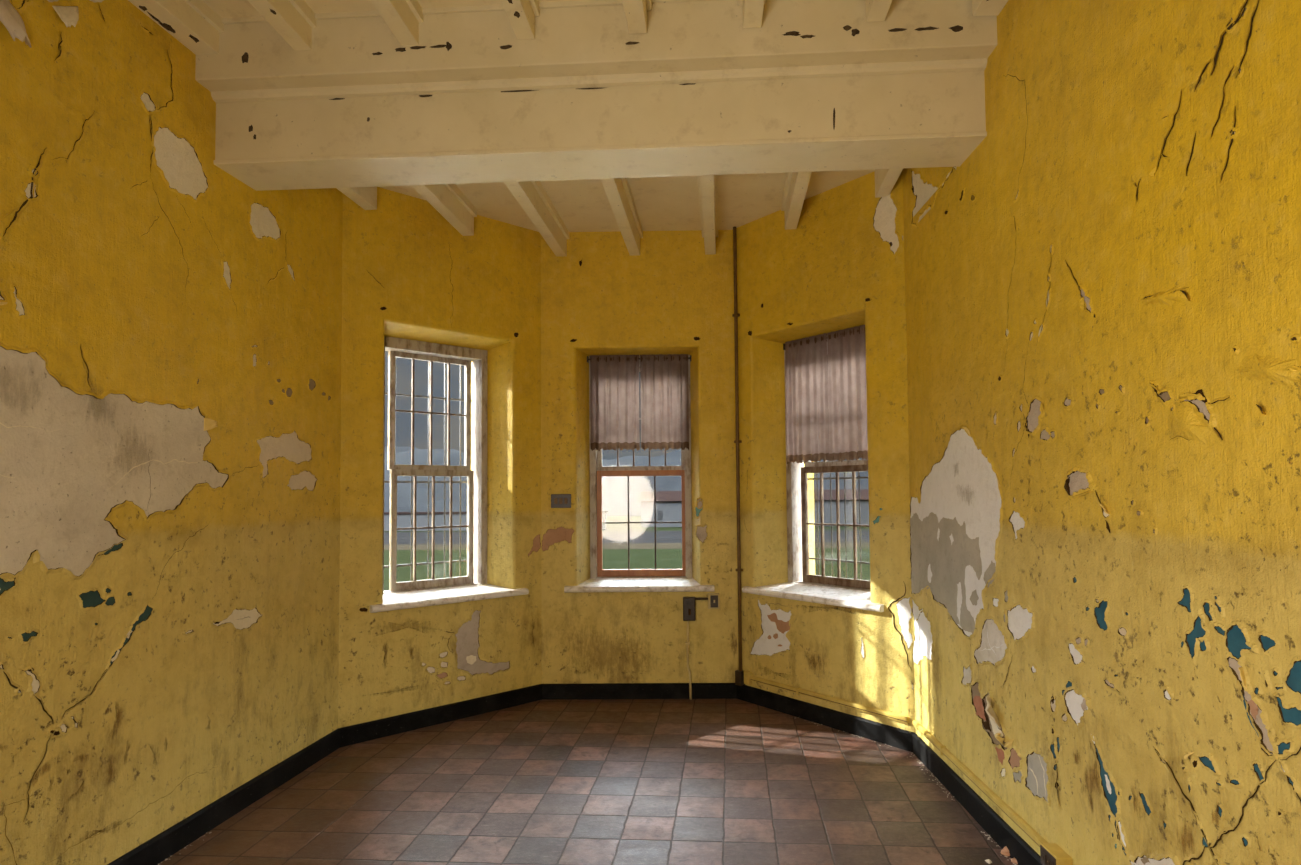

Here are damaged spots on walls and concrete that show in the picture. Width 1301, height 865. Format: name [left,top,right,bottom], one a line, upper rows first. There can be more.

peeling [0,0,106,63]
crack [1134,0,1259,202]
crack [1,111,95,239]
peeling [130,50,237,308]
peeling [248,200,281,242]
peeling [872,167,976,256]
spalling [0,342,318,823]
peeling [748,598,793,658]
peeling [910,425,1181,865]
peeling [1176,585,1301,850]
crack [3,794,40,865]
crack [1152,746,1233,865]